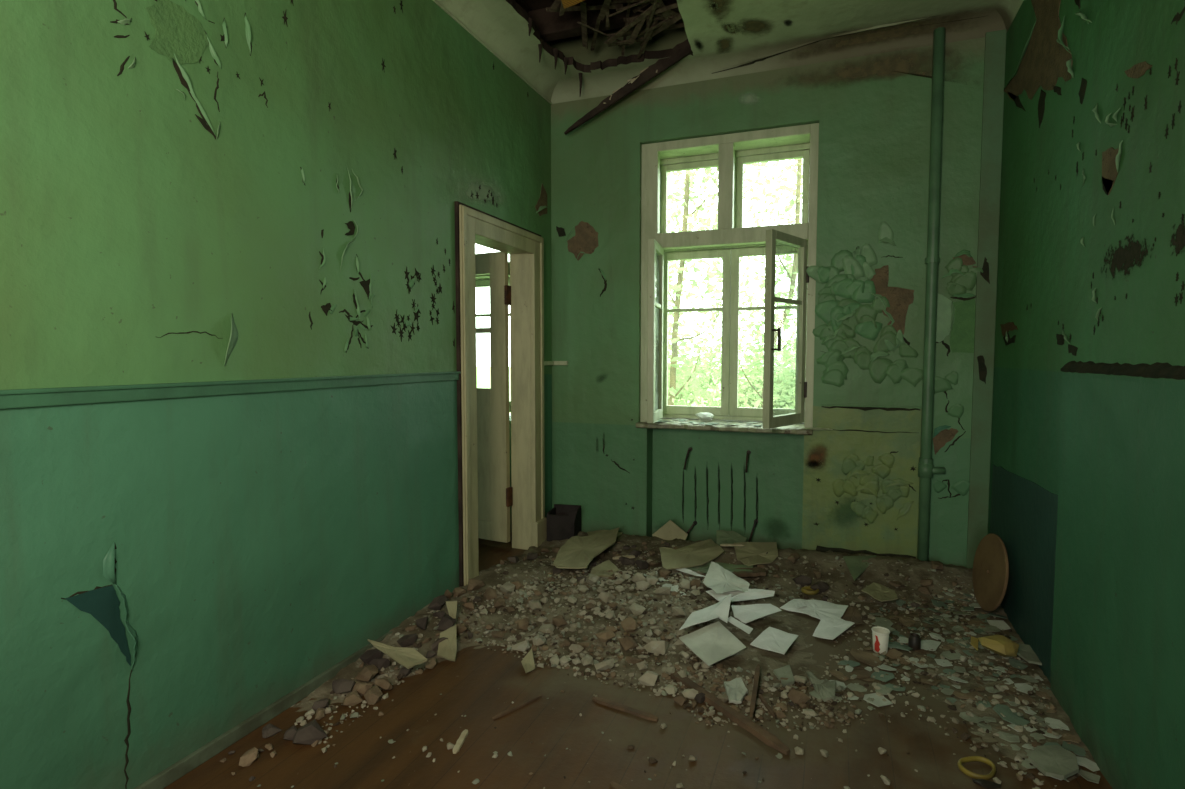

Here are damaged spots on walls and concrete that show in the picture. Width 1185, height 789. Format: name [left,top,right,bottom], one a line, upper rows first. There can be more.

water stain [708,0,770,53]
flaking render [1004,0,1152,225]
peeling [309,168,375,353]
flaking render [556,221,598,261]
flaking render [806,221,966,455]